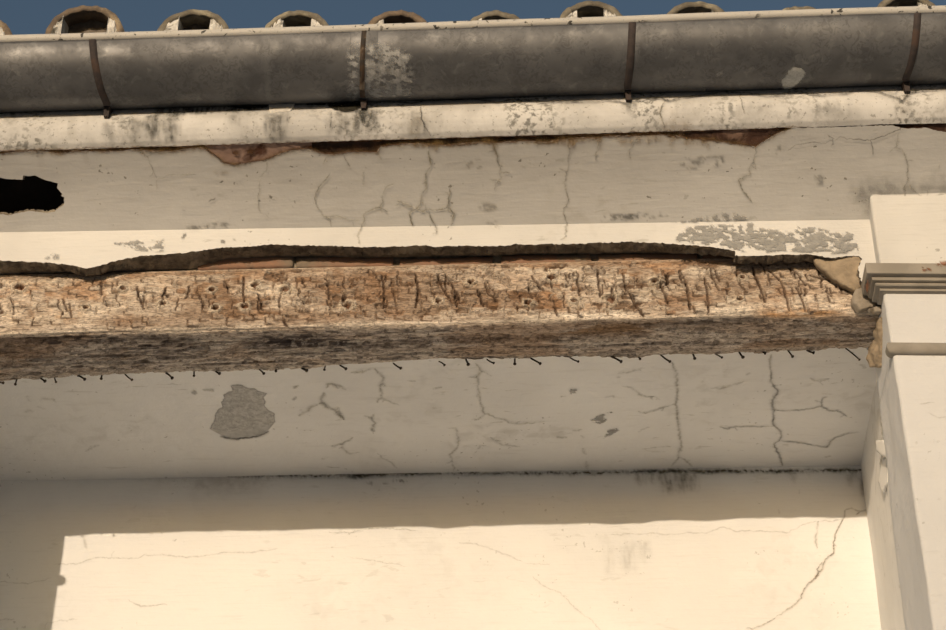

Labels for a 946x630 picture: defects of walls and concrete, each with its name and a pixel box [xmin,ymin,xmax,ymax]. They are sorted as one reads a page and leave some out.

spalling [0,127,814,165]
crack [0,88,945,201]
spalling [0,175,64,214]
crack [360,197,455,230]
spalling [0,213,883,368]
peeling [210,385,275,440]